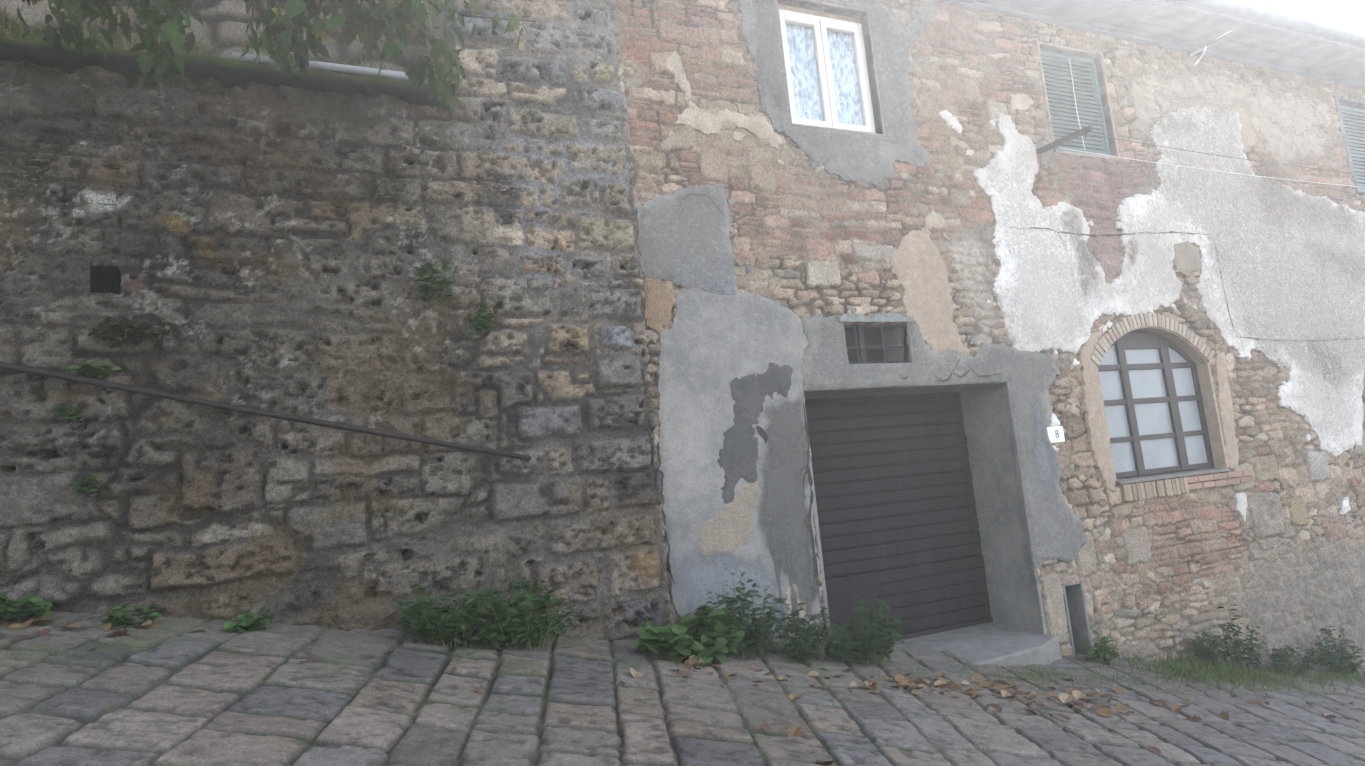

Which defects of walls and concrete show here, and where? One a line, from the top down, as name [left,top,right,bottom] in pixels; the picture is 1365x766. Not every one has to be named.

flaking render [666,51,786,166]
flaking render [881,70,1365,457]
flaking render [642,278,821,644]